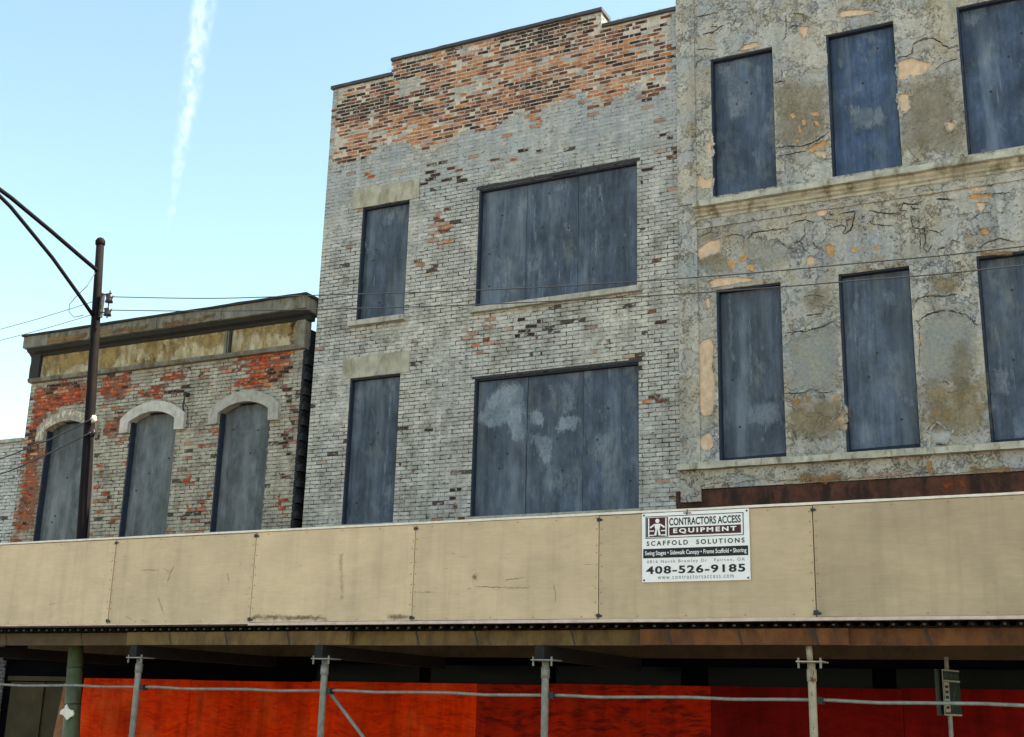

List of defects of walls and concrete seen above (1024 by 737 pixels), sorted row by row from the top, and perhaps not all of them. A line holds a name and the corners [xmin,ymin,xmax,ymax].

peeling [331,9,676,186]
crack [694,12,736,68]
spalling [894,55,932,114]
crack [897,36,958,69]
crack [776,131,829,156]
crack [701,184,1012,253]
spalling [697,237,756,310]
crack [786,291,834,335]
crack [915,293,978,364]
peeling [223,351,295,403]
spalling [699,337,717,452]
peeling [16,370,190,534]